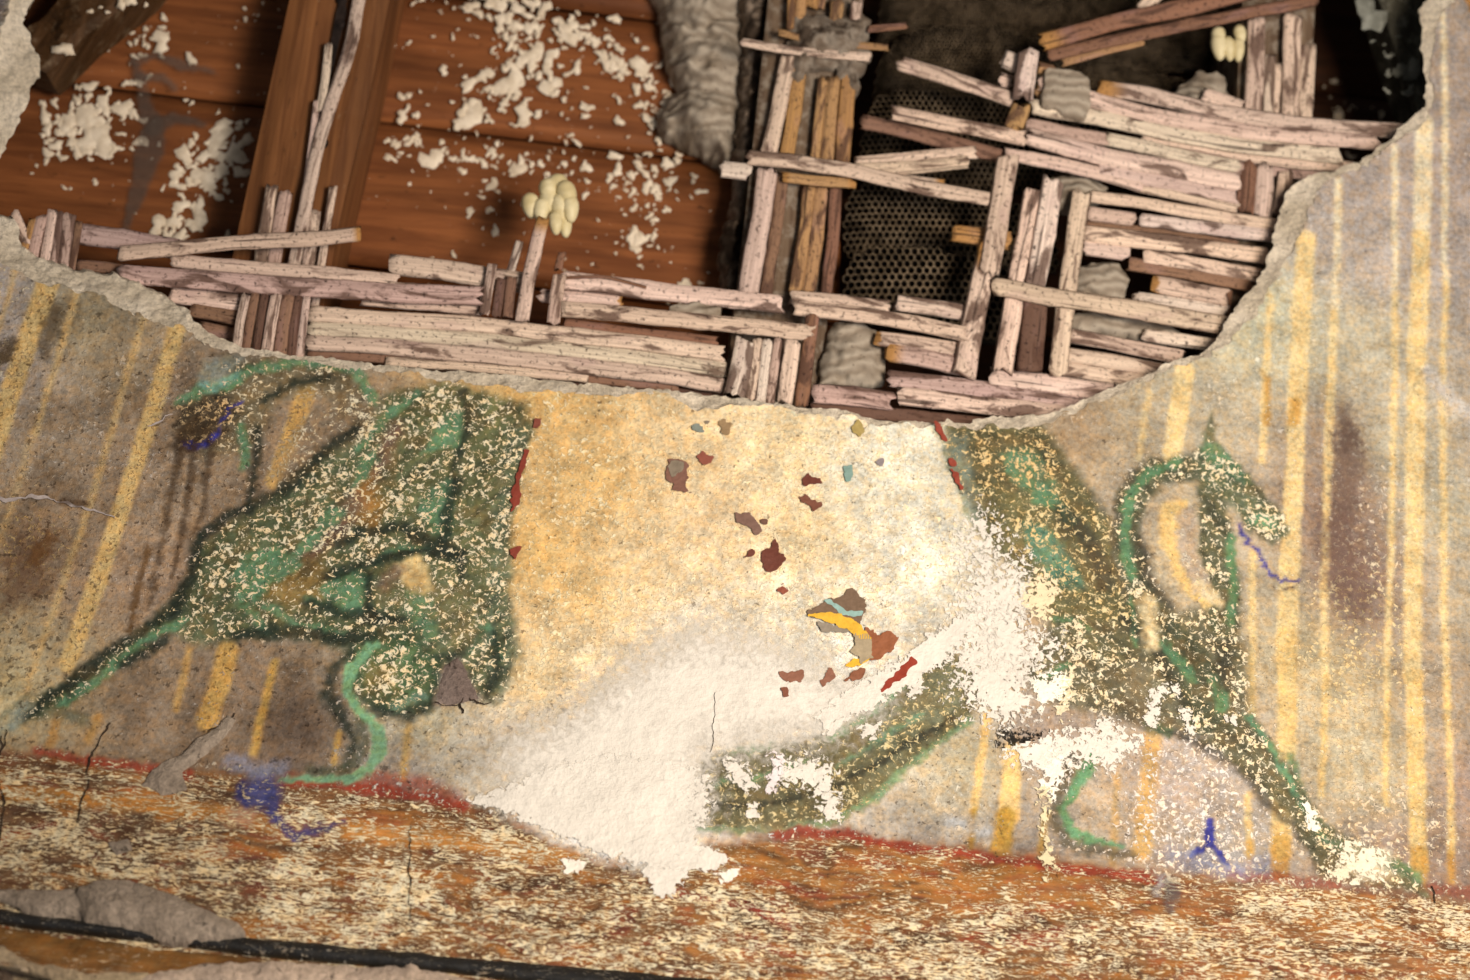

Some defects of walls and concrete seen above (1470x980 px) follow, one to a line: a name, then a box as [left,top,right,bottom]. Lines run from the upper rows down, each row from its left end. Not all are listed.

flaking render [0,0,1456,441]
peeling [666,451,714,493]
peeling [466,449,1196,898]
crack [77,723,110,822]
flaking render [142,715,236,796]
peeling [1301,801,1402,894]